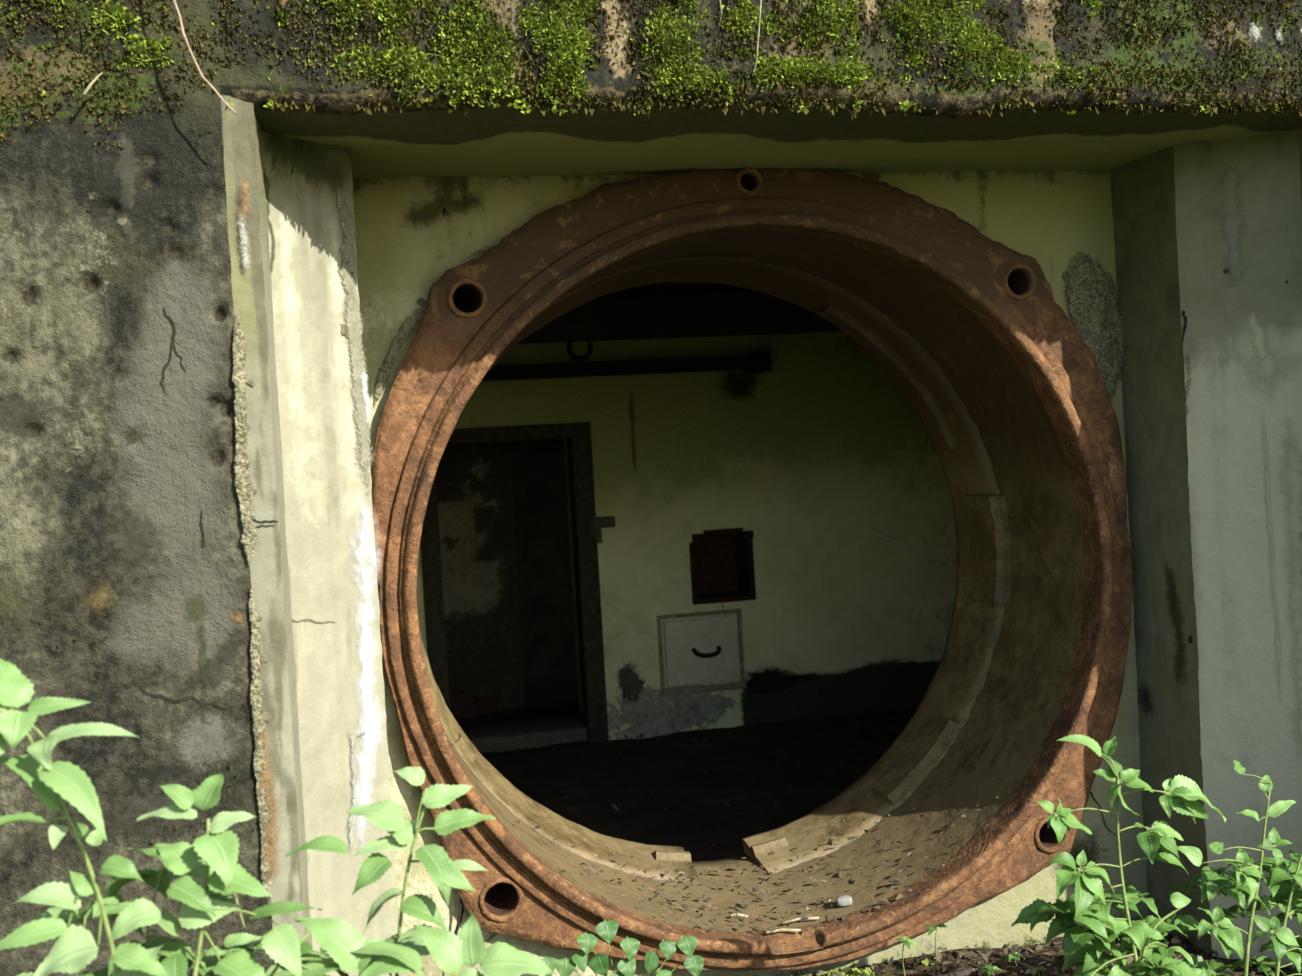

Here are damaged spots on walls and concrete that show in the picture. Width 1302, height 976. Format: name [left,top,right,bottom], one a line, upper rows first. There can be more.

damp [110,132,141,247]
crack [106,306,187,396]
spalling [1062,250,1123,402]
damp [362,372,370,422]
damp [106,513,154,565]
damp [189,600,246,684]
damp [348,510,379,849]
peeling [607,663,738,740]
spalling [249,590,272,904]
damp [107,771,231,835]